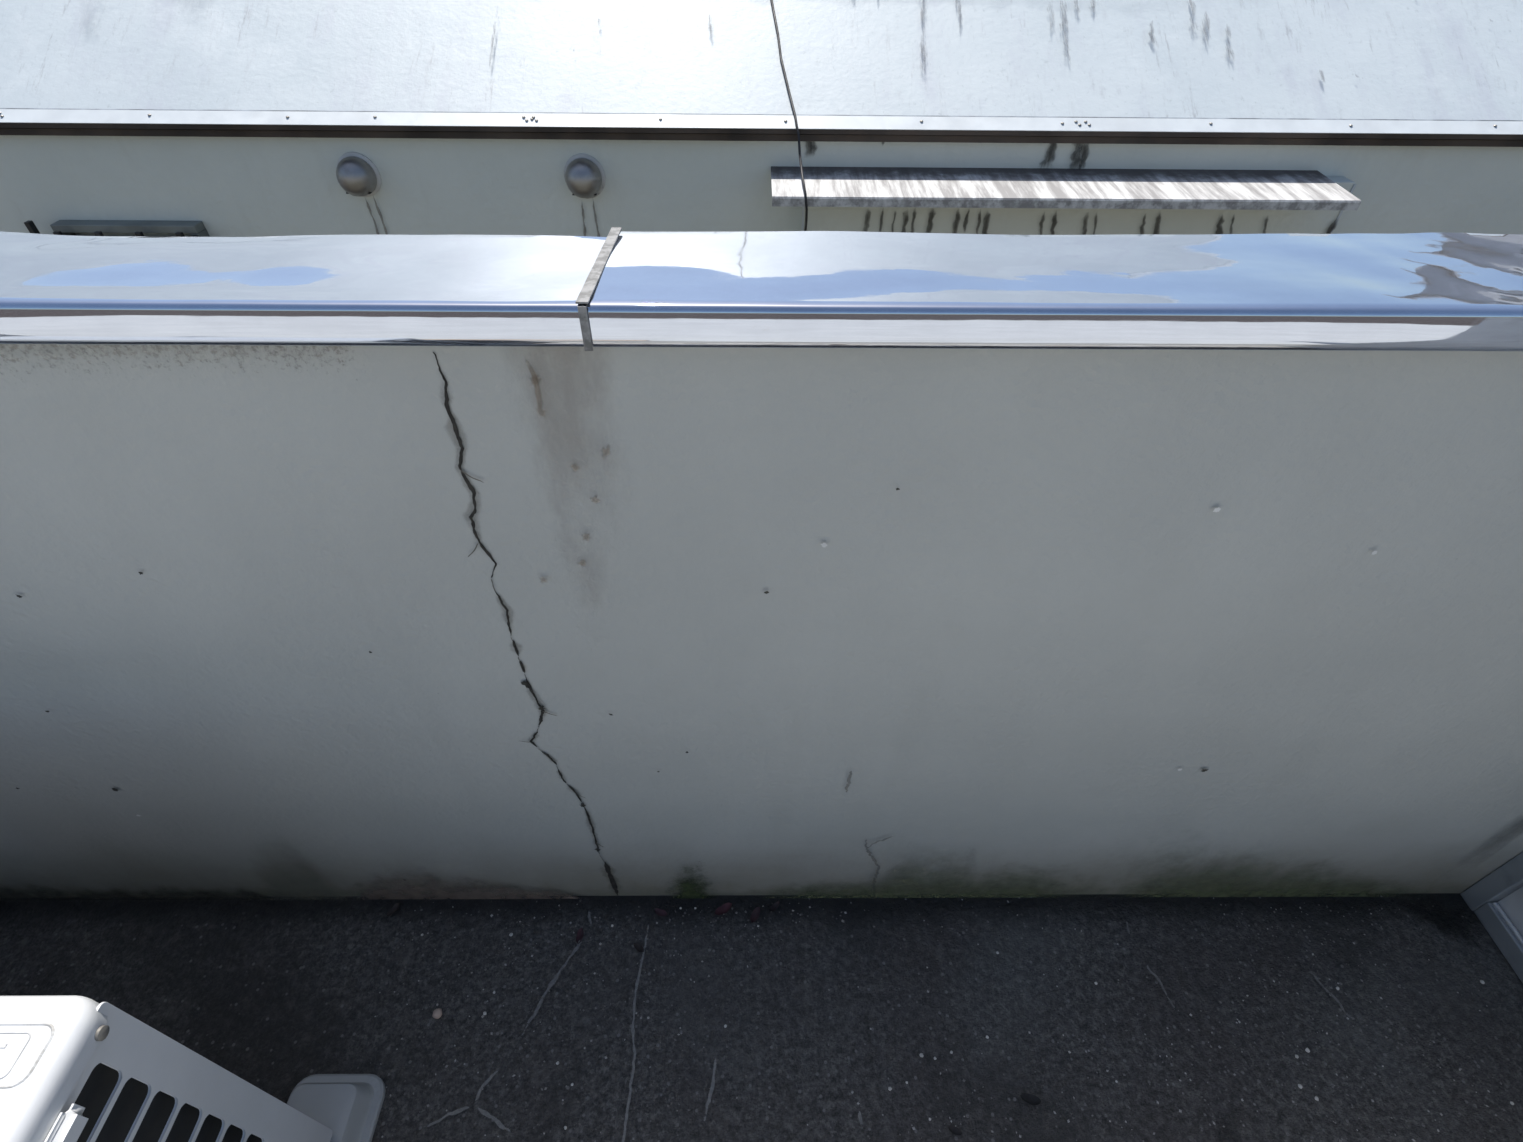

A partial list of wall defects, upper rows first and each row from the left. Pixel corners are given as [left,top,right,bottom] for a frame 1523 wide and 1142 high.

damp [1042,143,1088,167]
damp [864,211,935,233]
damp [953,211,990,234]
damp [1040,214,1057,235]
damp [1140,215,1161,234]
damp [1216,217,1234,234]
crack [427,352,618,1134]
damp [363,879,579,900]
crack [622,926,649,1142]